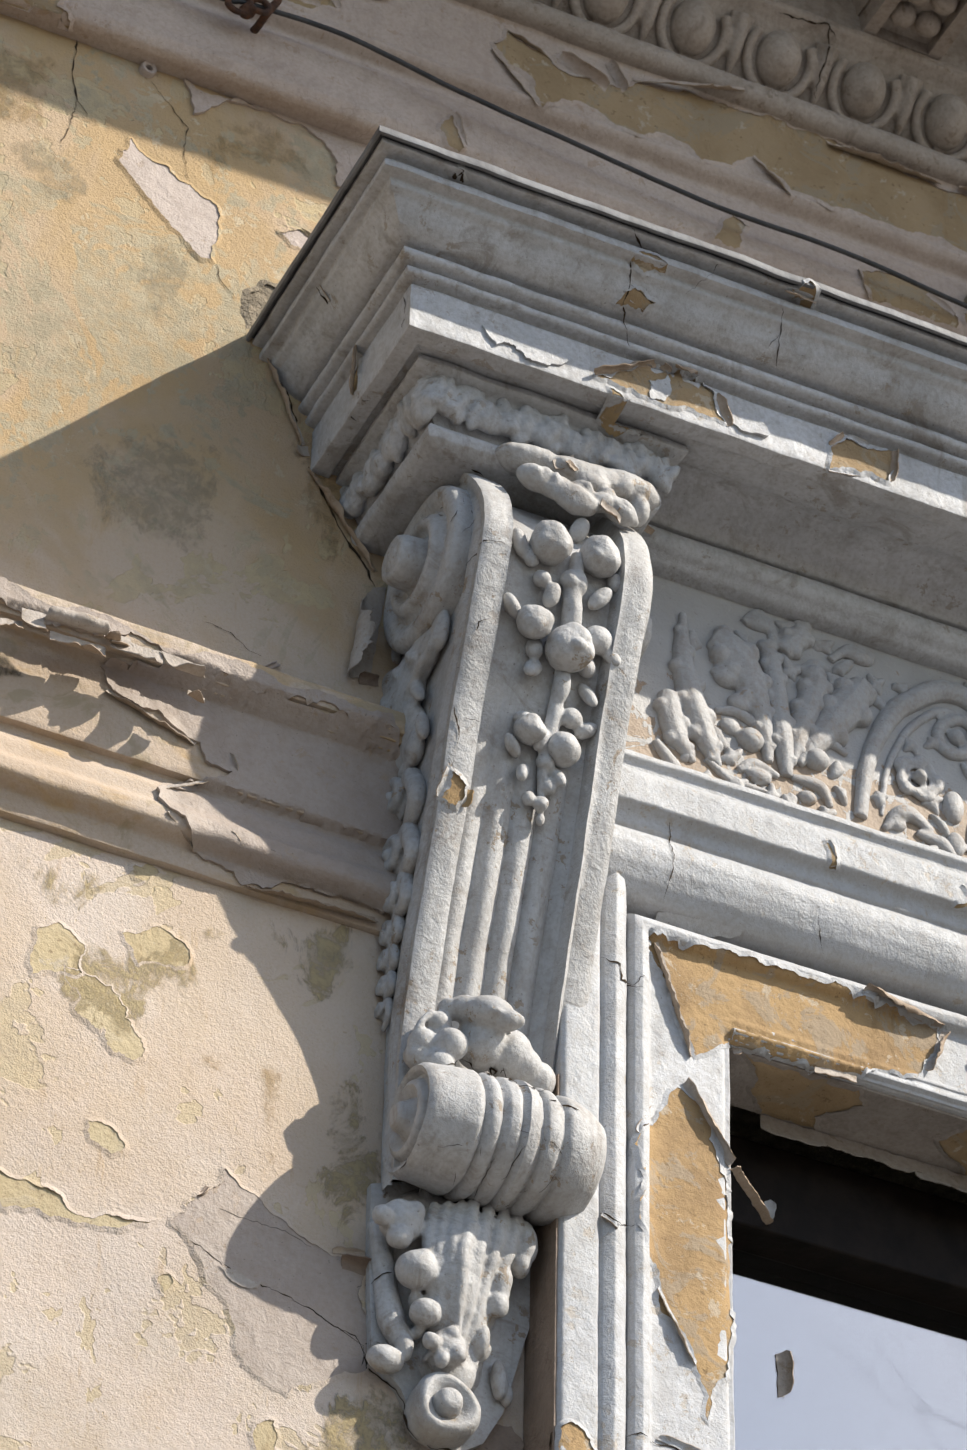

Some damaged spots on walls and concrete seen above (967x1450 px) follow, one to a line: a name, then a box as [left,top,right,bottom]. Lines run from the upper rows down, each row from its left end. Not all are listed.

crack [61,40,87,142]
peeling [113,135,224,266]
peeling [489,28,967,256]
peeling [858,268,967,337]
spalling [593,359,733,441]
spalling [825,432,902,487]
peeling [0,577,402,923]
peeling [648,912,967,1192]
peeling [0,1164,372,1399]
peeling [629,1077,776,1427]
peeling [554,1418,598,1450]
peeling [775,1350,794,1397]